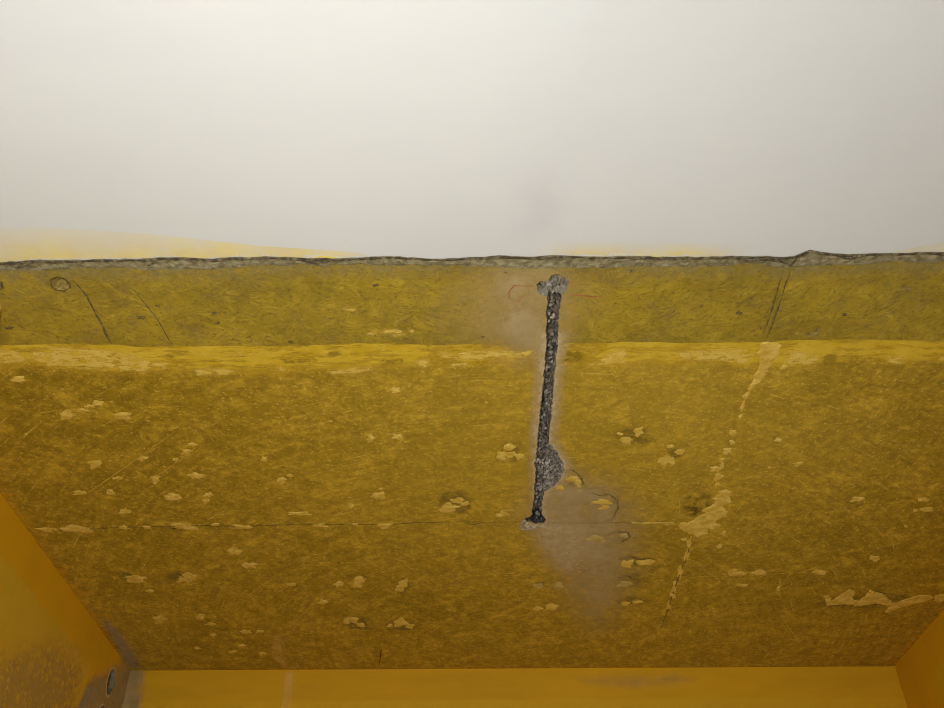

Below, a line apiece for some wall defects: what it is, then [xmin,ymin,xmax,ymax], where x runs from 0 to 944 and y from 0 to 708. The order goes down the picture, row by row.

crack [0,250,944,345]
spalling [0,250,944,549]
leakage [473,268,629,617]
peeling [823,589,944,613]